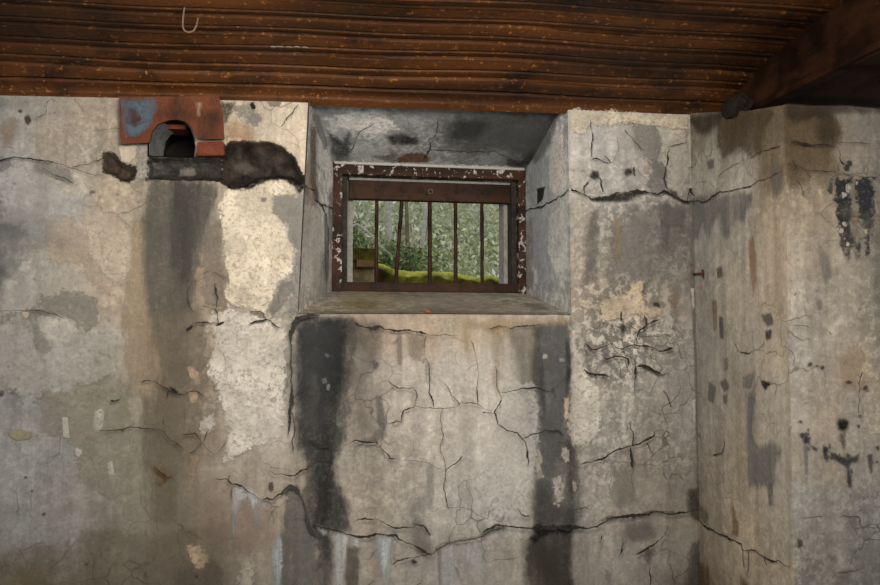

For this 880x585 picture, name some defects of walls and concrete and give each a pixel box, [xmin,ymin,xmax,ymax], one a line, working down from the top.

crack [0,156,105,184]
spalling [102,140,304,190]
crack [526,121,880,211]
crack [186,271,226,331]
water stain [141,178,217,520]
crack [100,420,226,454]
crack [142,380,205,398]
water stain [297,318,378,585]
water stain [364,396,386,441]
crack [218,311,795,585]
water stain [523,325,581,585]
water stain [799,420,879,487]